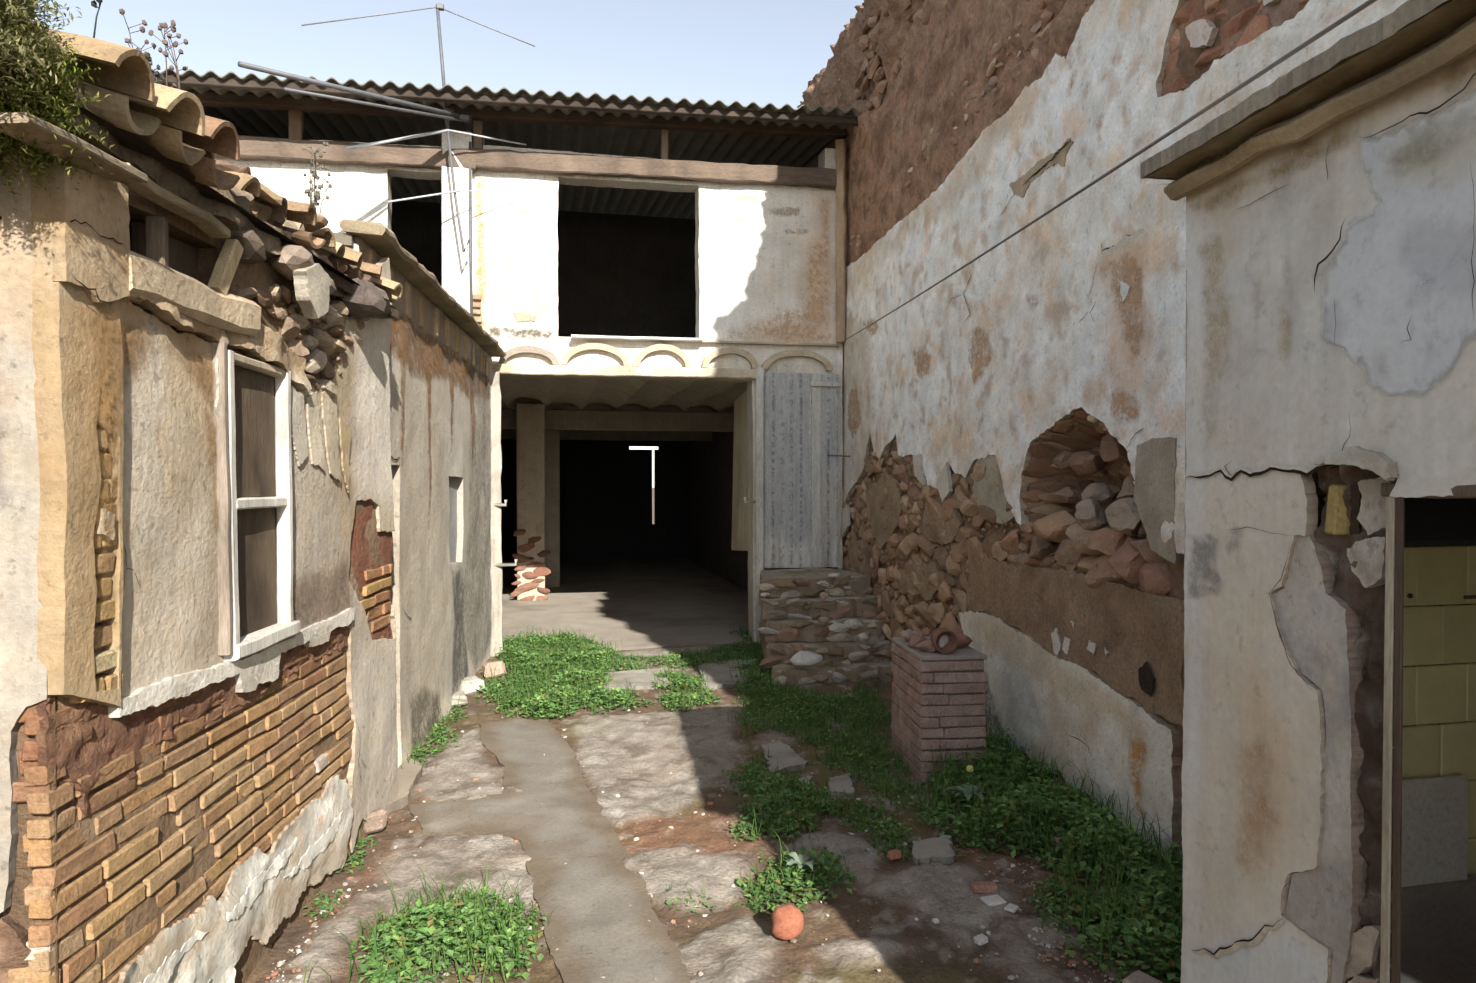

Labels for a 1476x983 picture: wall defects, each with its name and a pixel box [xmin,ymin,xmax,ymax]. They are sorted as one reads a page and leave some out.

spalling [0,384,354,983]
spalling [219,227,393,640]
spalling [473,294,482,326]
spalling [764,372,1184,726]
crack [1185,419,1351,481]
crack [1314,222,1344,341]
spalling [1315,465,1399,983]
peeling [1323,91,1476,394]
crack [1325,73,1476,178]
crack [1468,165,1476,321]